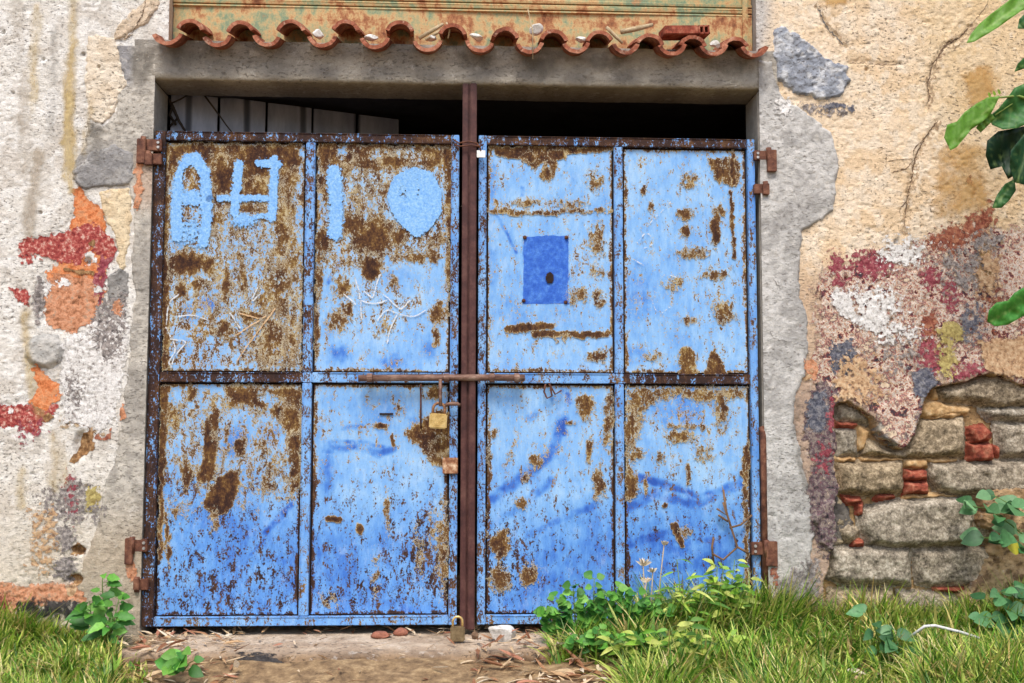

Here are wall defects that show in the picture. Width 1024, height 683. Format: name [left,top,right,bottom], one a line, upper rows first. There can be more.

corrosion [486,168,614,310]
corrosion [488,145,613,182]
corrosion [668,149,743,280]
spalling [770,94,855,124]
crack [880,2,988,235]
peeling [0,187,132,620]
corrosion [157,141,451,569]
corrosion [504,320,612,364]
corrosion [565,345,749,507]
spalling [803,222,1024,614]
corrosion [485,509,541,594]
corrosion [739,440,752,596]